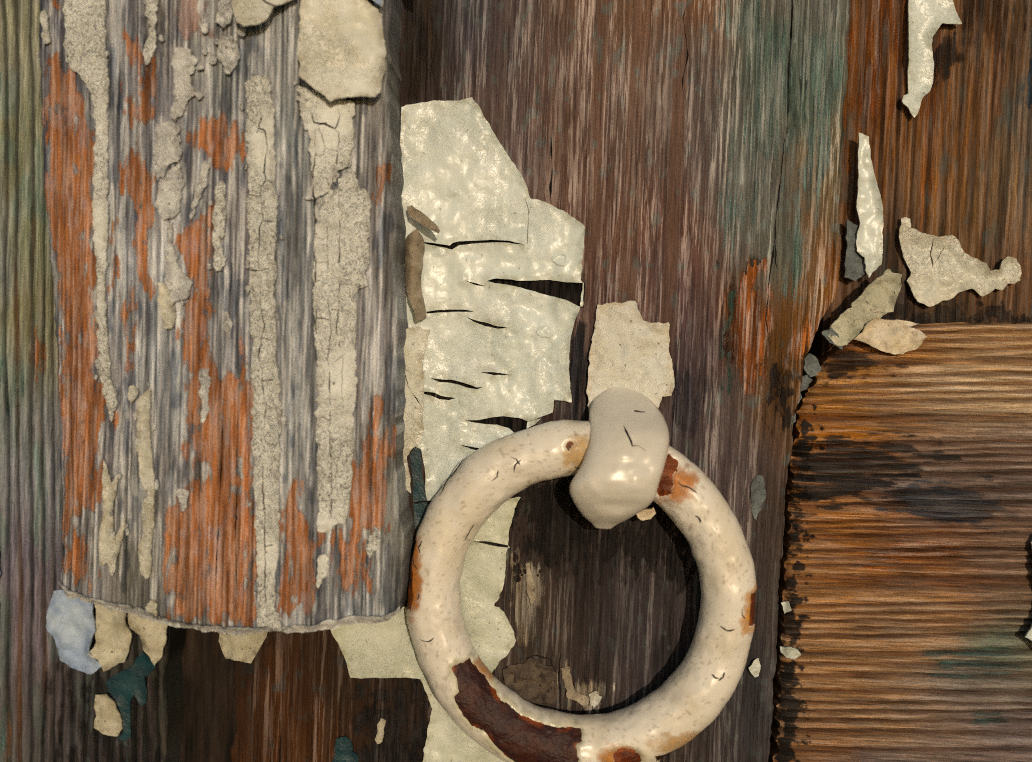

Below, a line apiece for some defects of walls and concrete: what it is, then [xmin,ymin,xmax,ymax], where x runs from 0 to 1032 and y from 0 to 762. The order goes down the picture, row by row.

peeling [901,0,962,118]
peeling [821,133,1022,350]
peeling [40,0,585,762]
peeling [586,301,675,410]
corrosion [636,454,698,520]
corrosion [452,657,582,762]
peeling [553,654,615,715]
corrosion [600,747,642,762]
corrosion [655,734,698,761]